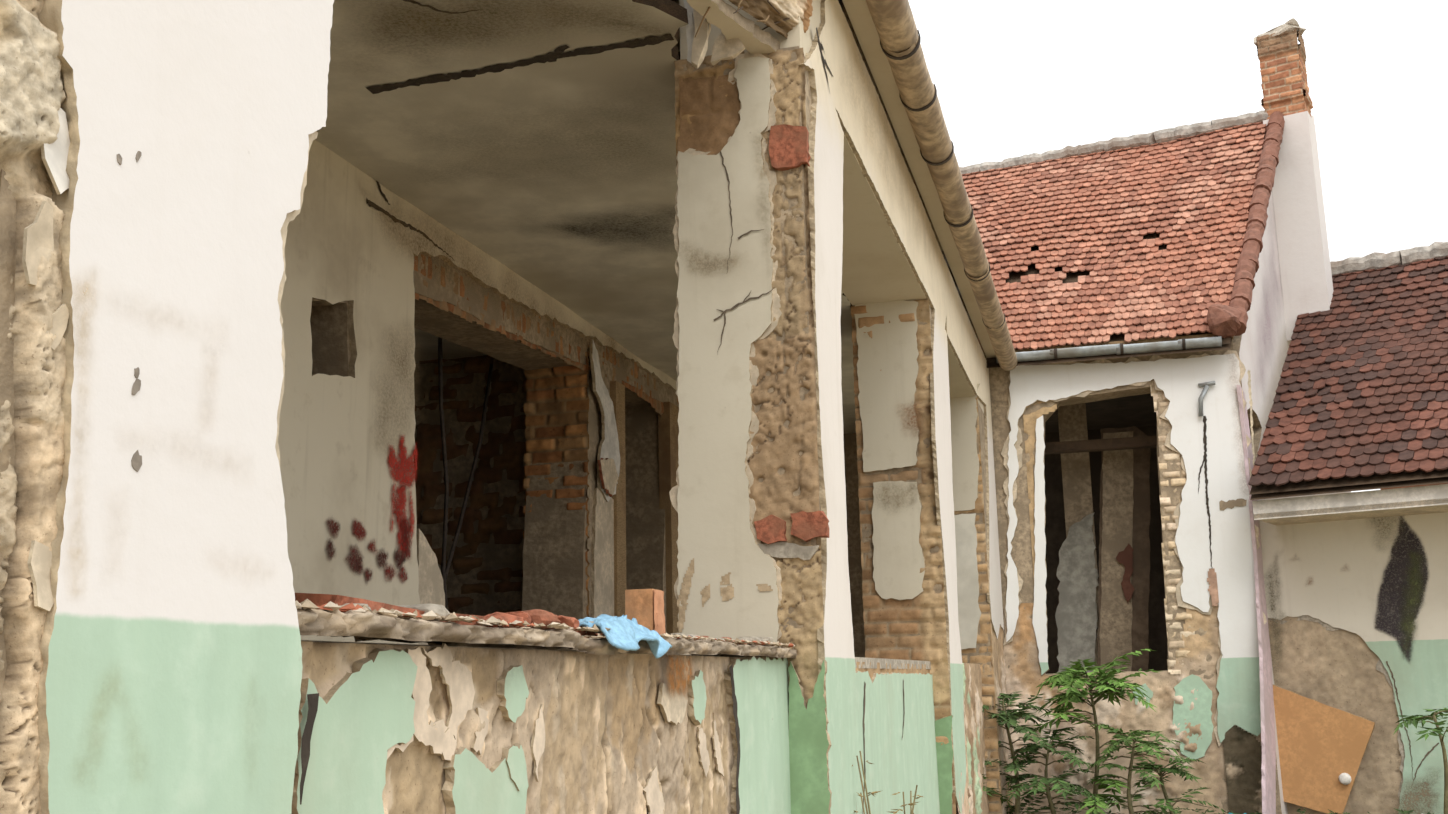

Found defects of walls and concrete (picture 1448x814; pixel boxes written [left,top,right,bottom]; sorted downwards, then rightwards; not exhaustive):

crack [365,34,674,94]
crack [714,151,775,352]
flaking render [0,0,70,814]
spalling [291,0,829,814]
spalling [851,299,1229,814]
crack [1198,416,1247,567]
crack [1247,370,1255,466]
mould [1374,516,1428,661]
spalling [1268,616,1403,814]